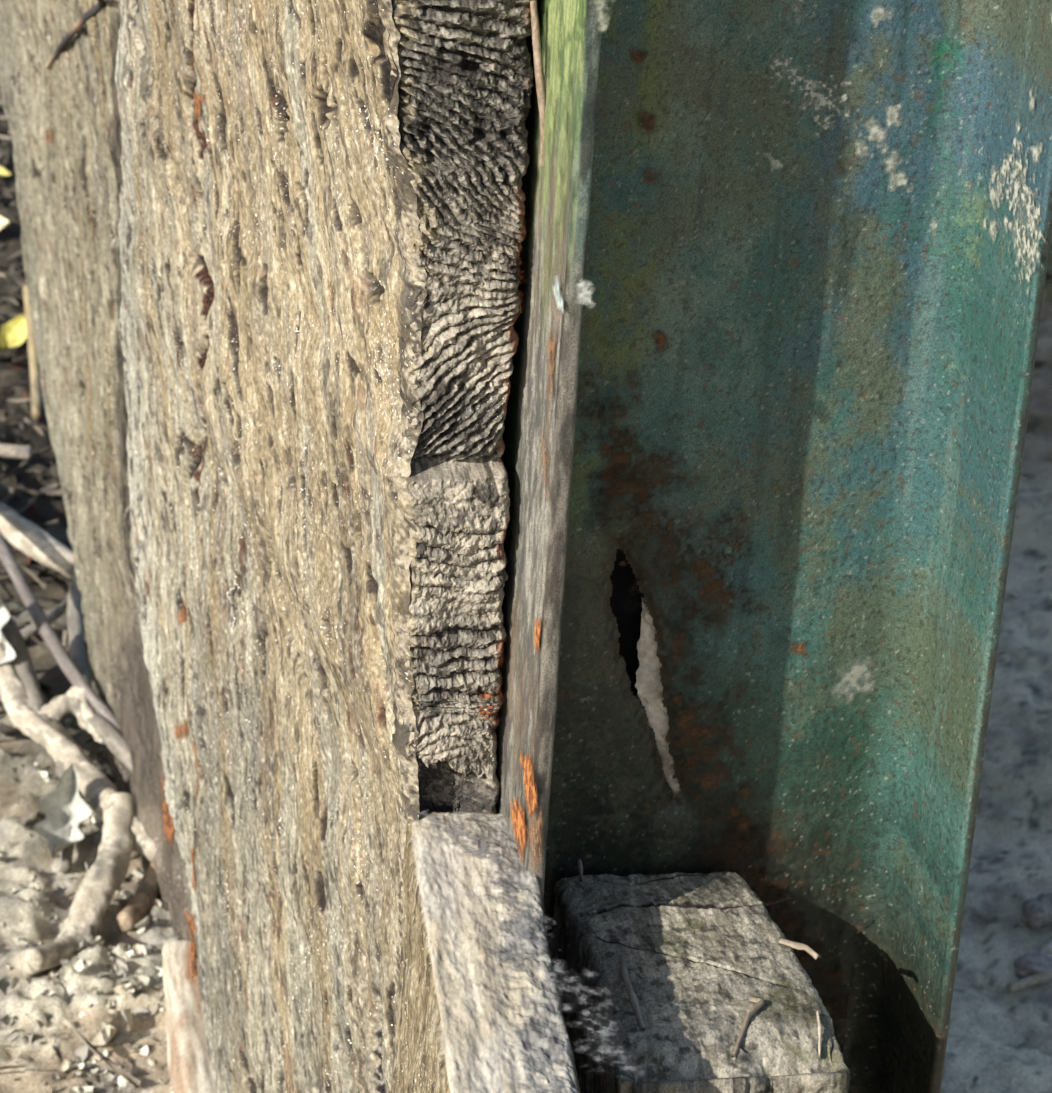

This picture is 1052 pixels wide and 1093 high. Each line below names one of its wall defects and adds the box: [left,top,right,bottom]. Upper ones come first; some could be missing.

corrosion [161,764,175,841]
corrosion [511,753,542,868]
crack [587,863,791,987]
corrosion [711,831,841,984]